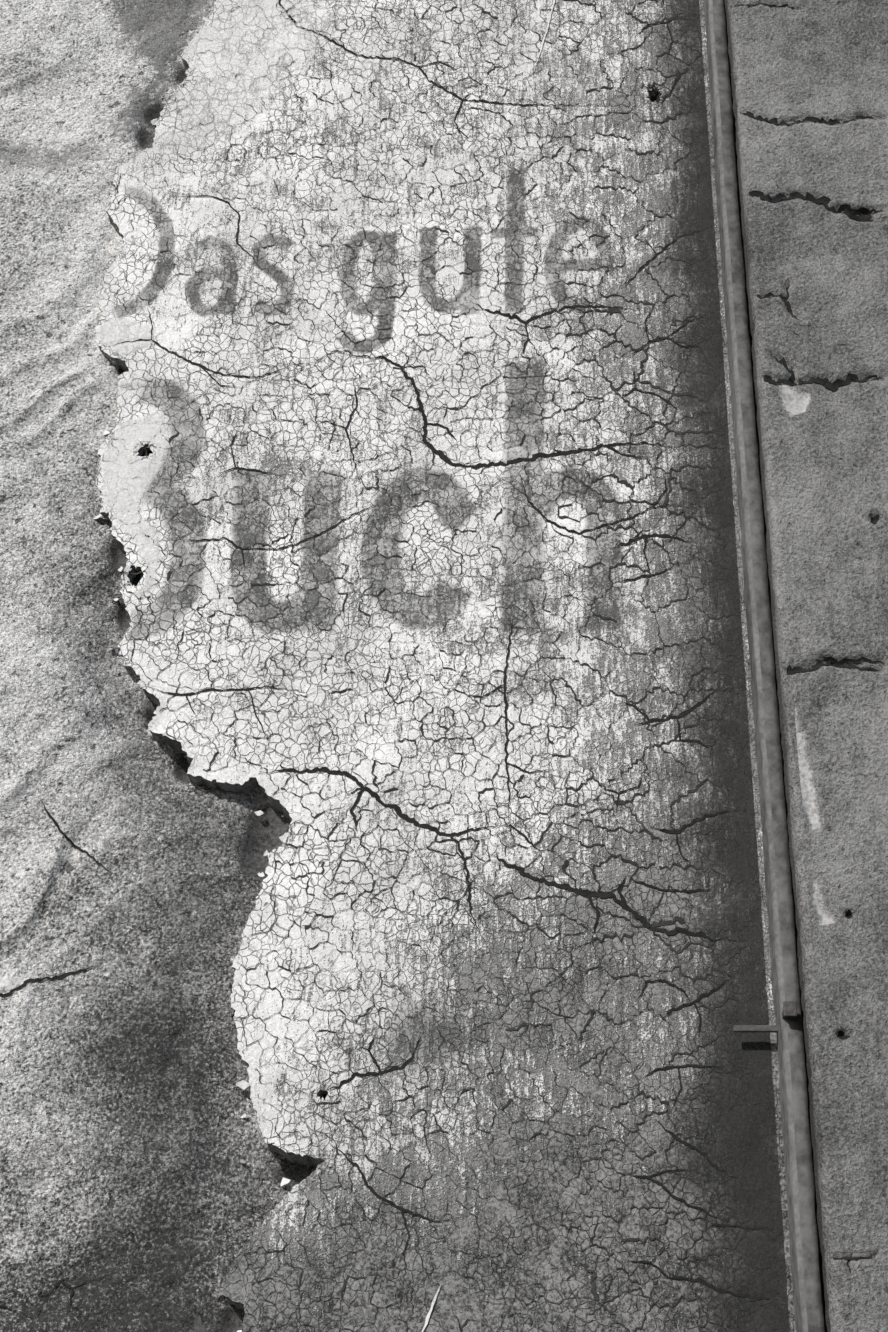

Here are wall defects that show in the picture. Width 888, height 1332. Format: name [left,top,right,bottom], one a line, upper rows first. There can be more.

spalling [647,85,664,104]
crack [742,111,883,125]
crack [749,190,881,222]
crack [757,284,799,320]
crack [764,356,883,391]
peeling [0,0,325,1332]
crack [102,0,795,1332]
crack [787,657,885,675]
crack [40,798,115,875]